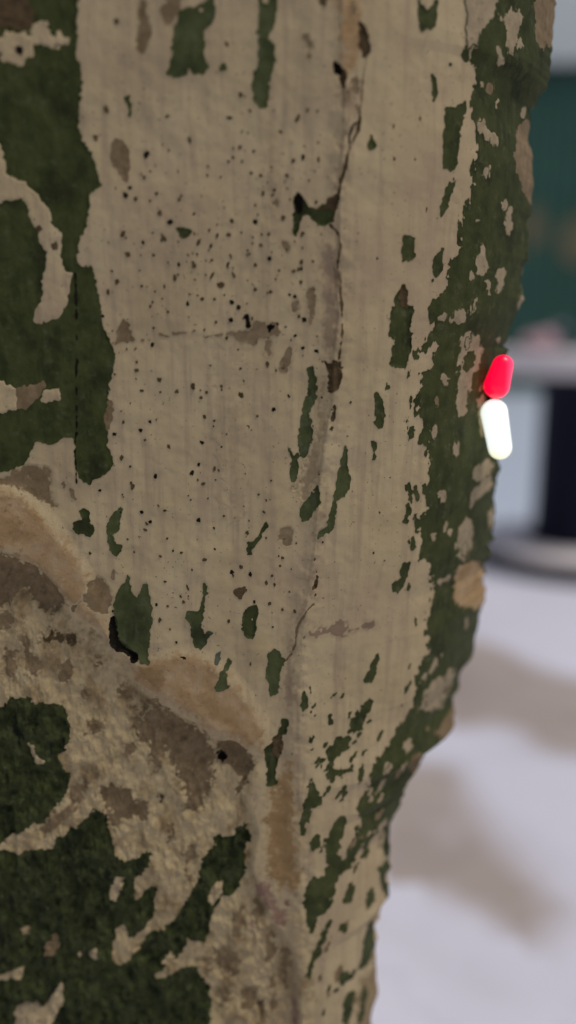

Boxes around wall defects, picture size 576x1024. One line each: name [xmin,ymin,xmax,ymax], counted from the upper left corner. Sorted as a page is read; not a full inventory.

peeling [0,0,144,557]
peeling [0,548,306,1024]
peeling [134,0,227,78]
flaking render [110,130,351,639]
crack [285,603,315,663]
crack [329,223,344,360]
crack [337,55,368,195]
peeling [298,0,557,1024]